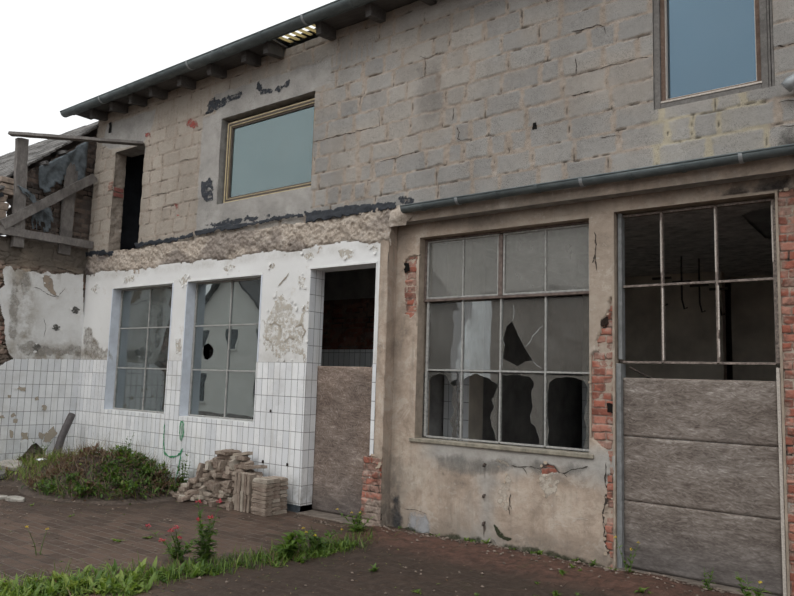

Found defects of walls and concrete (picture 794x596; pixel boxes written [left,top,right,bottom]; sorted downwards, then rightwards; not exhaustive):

peeling [41,275,59,296]
peeling [259,273,308,362]
spalling [402,256,418,318]
spalling [0,413,57,444]
spalling [588,298,616,568]
water stain [392,497,429,533]
crack [558,464,610,555]